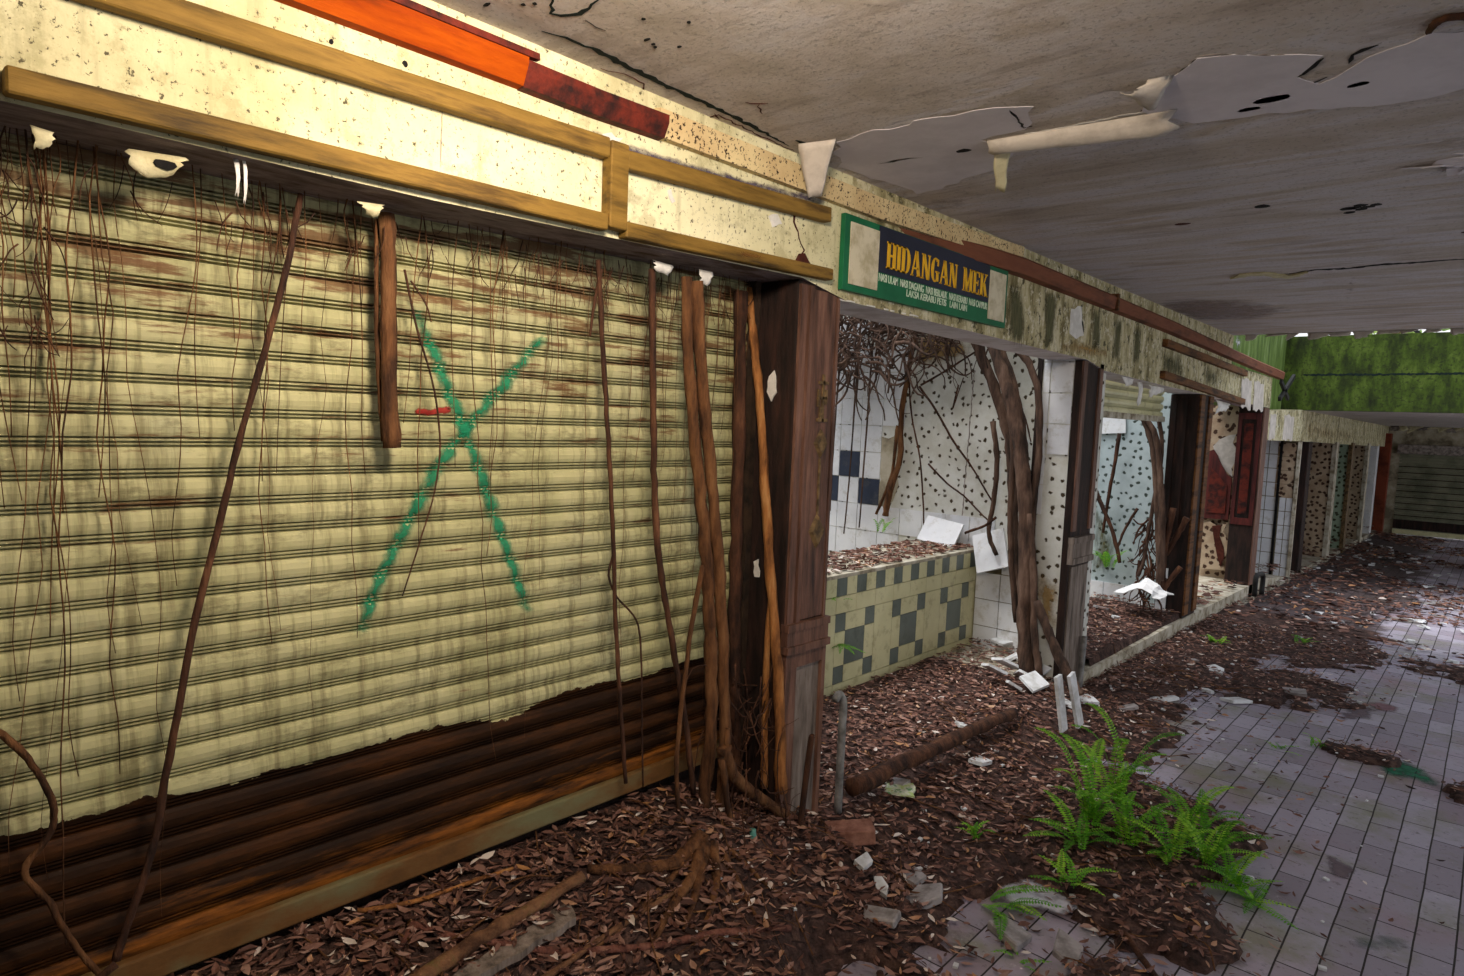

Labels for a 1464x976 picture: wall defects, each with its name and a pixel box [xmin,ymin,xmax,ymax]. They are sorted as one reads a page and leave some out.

crack [542,0,806,151]
peeling [1120,31,1464,124]
peeling [832,106,1034,194]